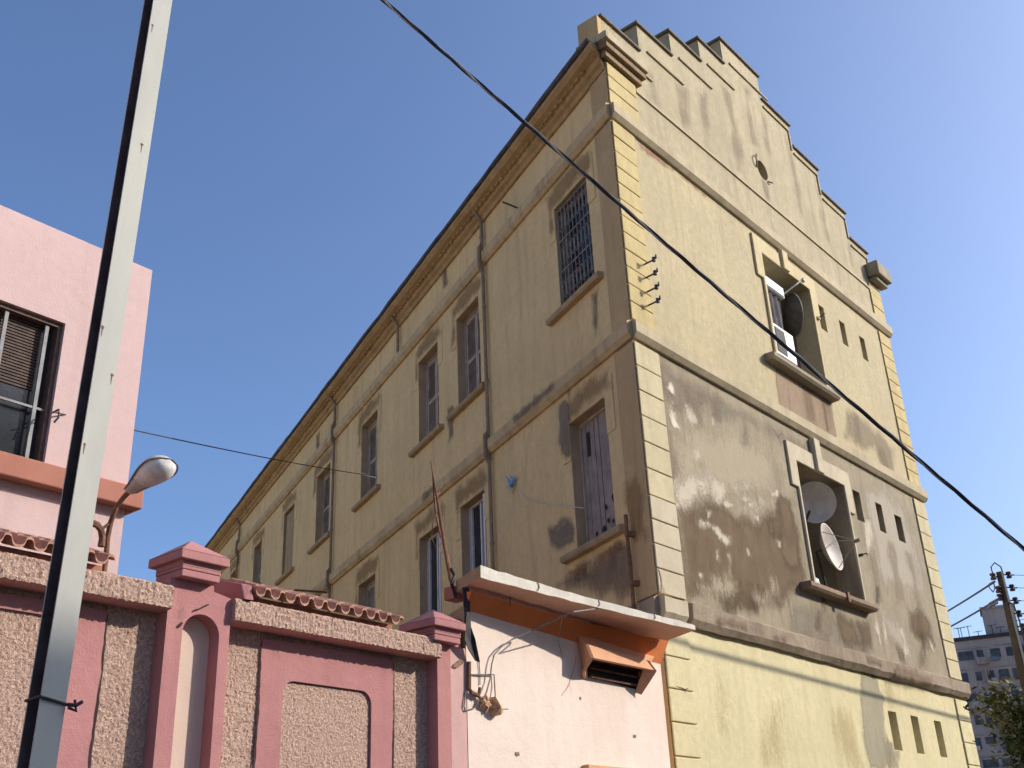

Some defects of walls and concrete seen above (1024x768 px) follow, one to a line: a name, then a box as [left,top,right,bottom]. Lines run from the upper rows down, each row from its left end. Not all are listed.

water stain [513,384,552,421]
peeling [669,405,714,429]
water stain [660,367,757,485]
water stain [776,369,893,471]
peeling [724,490,778,521]
peeling [699,511,731,560]
water stain [863,519,875,553]
water stain [674,496,805,629]
water stain [777,596,935,684]